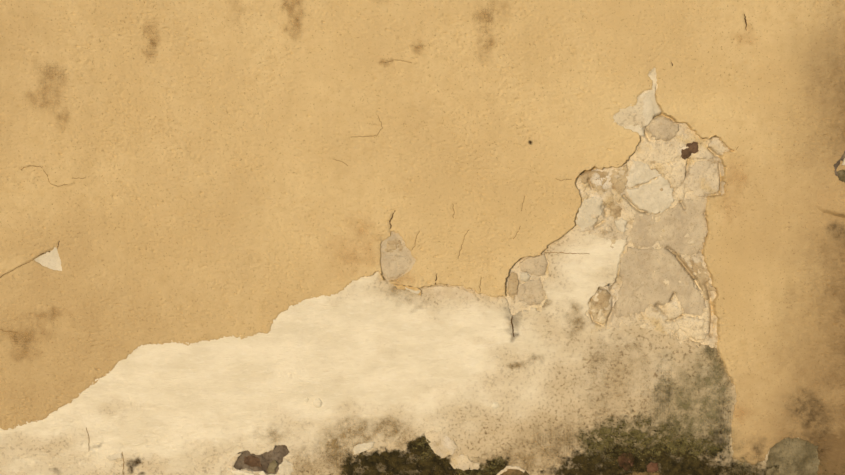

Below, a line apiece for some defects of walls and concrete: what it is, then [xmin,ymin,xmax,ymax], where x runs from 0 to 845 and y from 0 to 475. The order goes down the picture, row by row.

spalling [573,68,730,348]
spalling [834,151,845,183]
damp [326,421,399,474]
peeling [0,227,820,475]